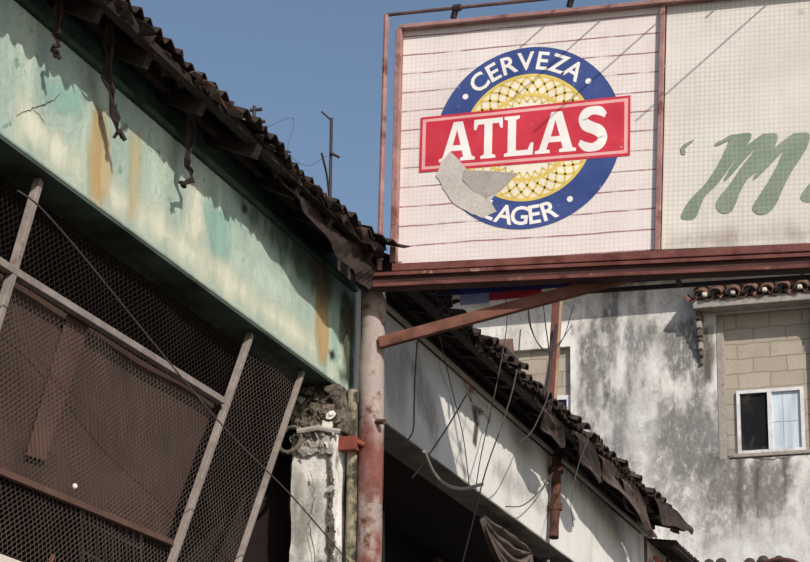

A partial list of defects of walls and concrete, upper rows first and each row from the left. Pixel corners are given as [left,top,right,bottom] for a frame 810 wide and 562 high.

crack [18,93,61,123]
spalling [289,396,336,562]
damp [580,292,631,456]
damp [625,319,792,514]